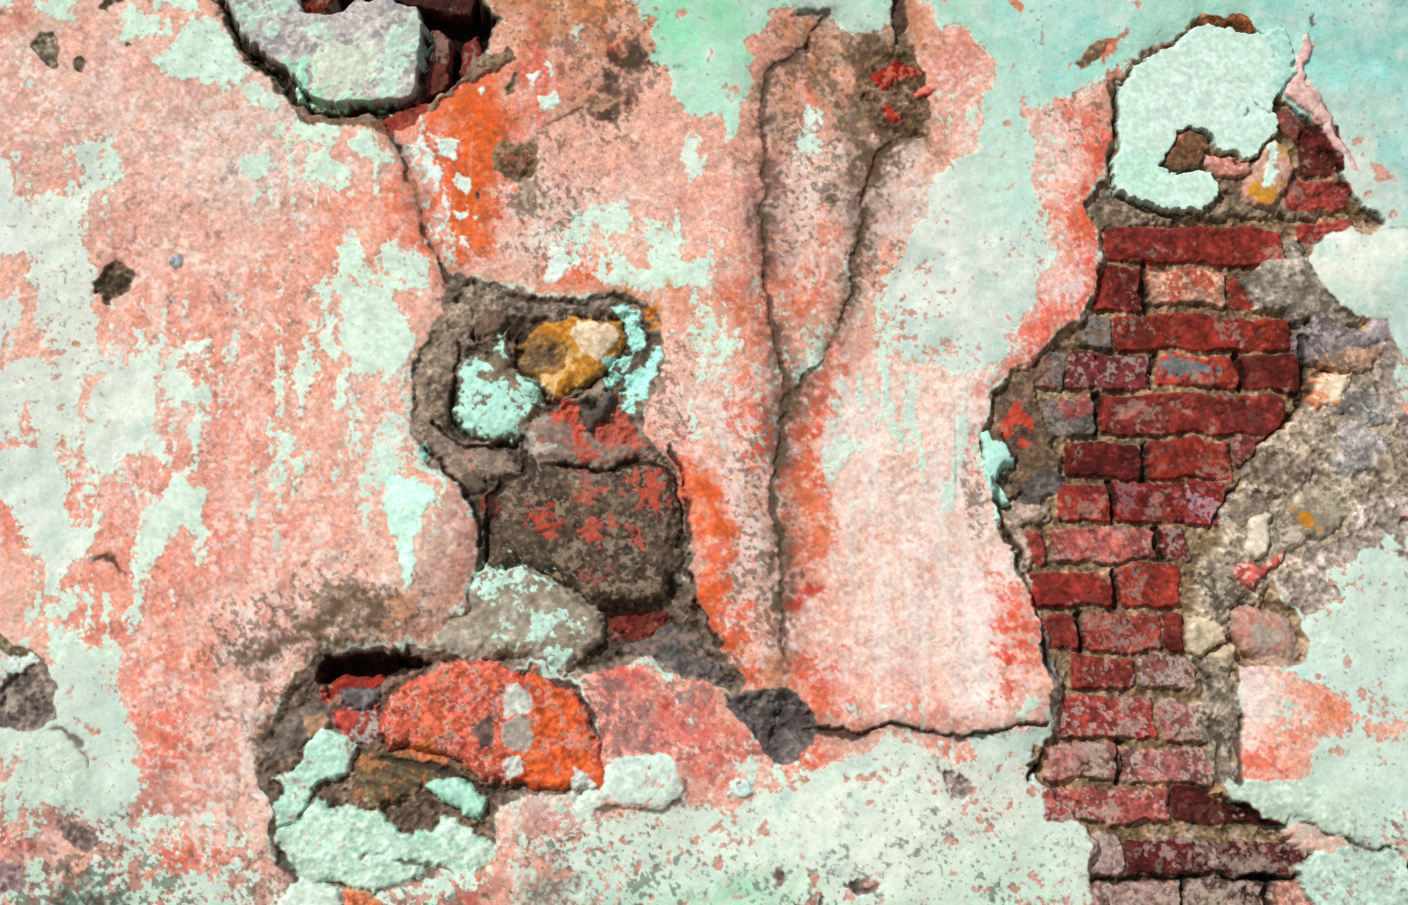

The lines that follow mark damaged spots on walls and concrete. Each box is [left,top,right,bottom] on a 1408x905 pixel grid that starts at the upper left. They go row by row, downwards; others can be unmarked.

peeling [0,0,977,905]
crack [758,6,899,663]
crack [890,0,911,44]
crack [816,720,1051,744]
spalling [761,0,1408,905]
crack [1341,836,1408,856]